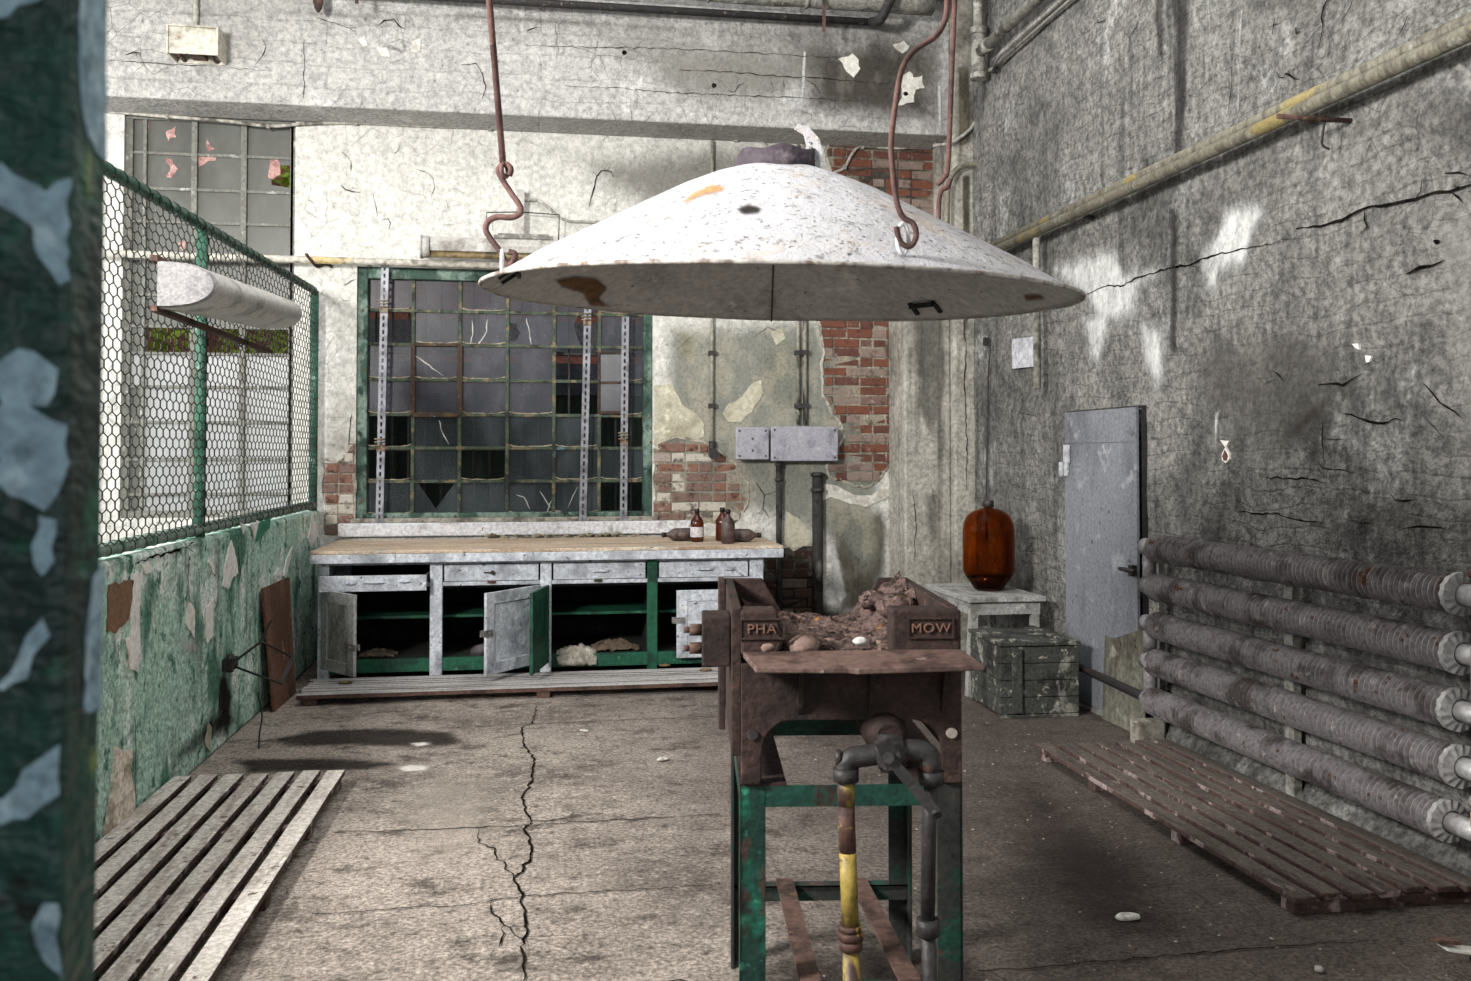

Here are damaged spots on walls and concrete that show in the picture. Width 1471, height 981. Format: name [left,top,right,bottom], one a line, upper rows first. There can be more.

peeling [79,0,107,162]
peeling [0,162,72,285]
flaking render [824,145,933,216]
crack [1087,171,1471,295]
peeling [0,348,69,576]
peeling [83,562,153,713]
peeling [185,517,271,644]
flaking render [273,443,357,581]
flaking render [652,384,750,524]
peeling [723,380,764,422]
flaking render [816,321,889,507]
crack [312,706,720,981]